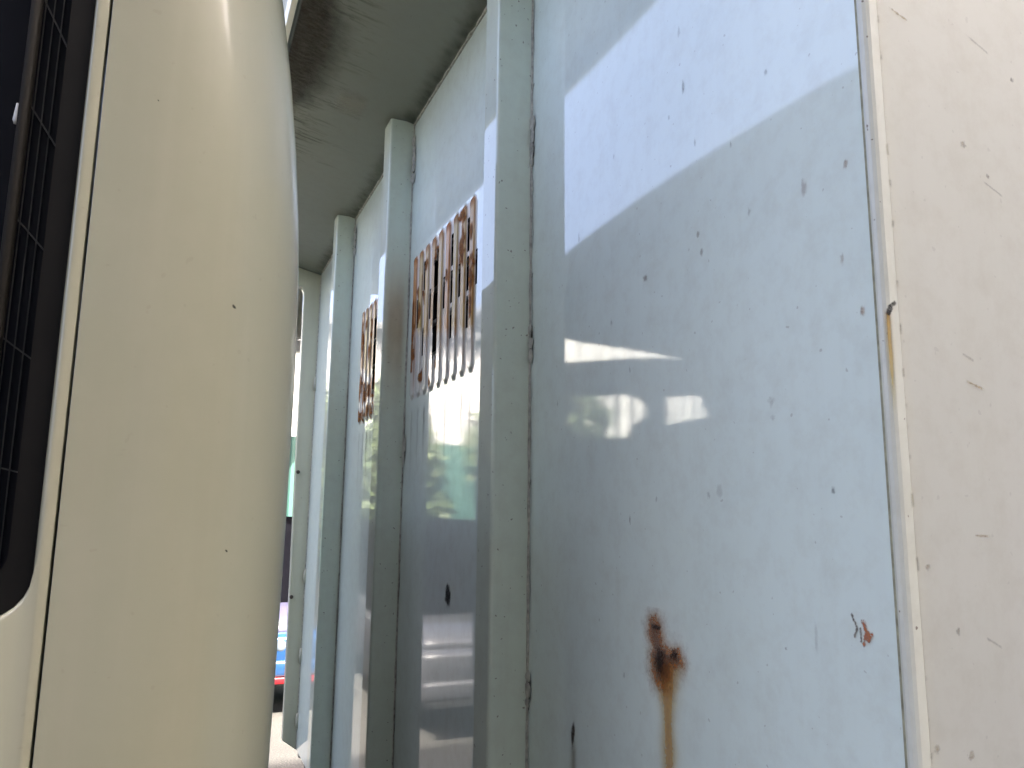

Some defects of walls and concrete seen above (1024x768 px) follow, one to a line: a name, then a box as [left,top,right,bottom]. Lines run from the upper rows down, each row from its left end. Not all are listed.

corrosion [414,198,475,318]
corrosion [410,287,436,387]
corrosion [647,614,684,768]